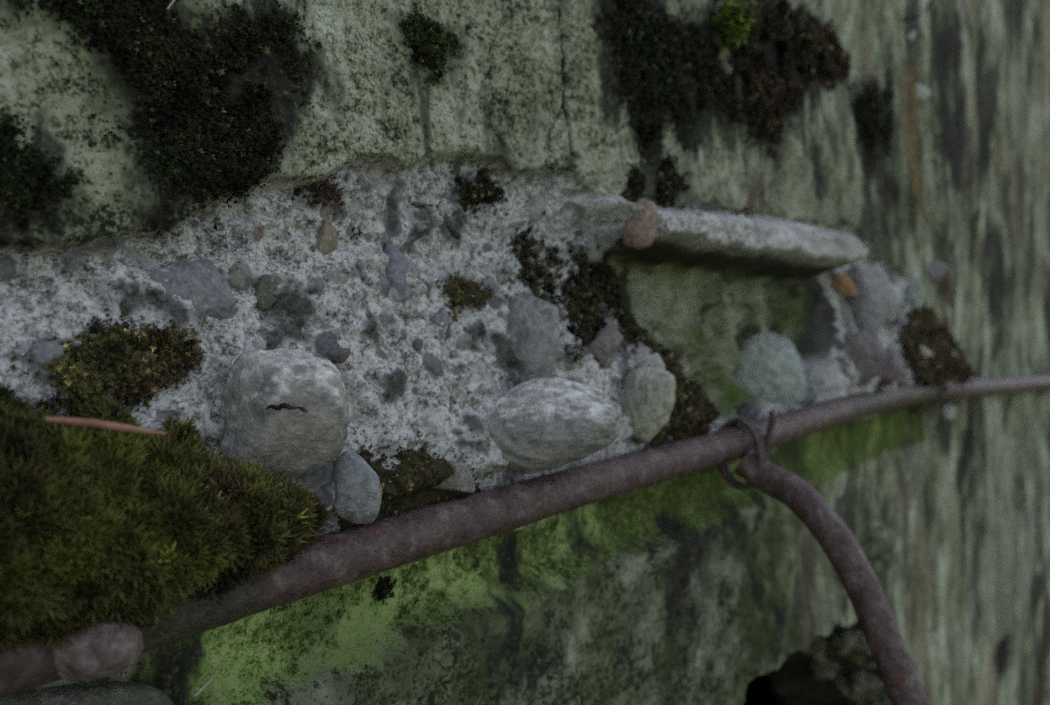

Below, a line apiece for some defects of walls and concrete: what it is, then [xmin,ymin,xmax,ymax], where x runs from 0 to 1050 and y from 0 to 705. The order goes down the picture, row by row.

spalling [0,151,923,536]
rust [0,632,63,698]
rust [131,375,1050,654]
rust [1033,585,1050,705]